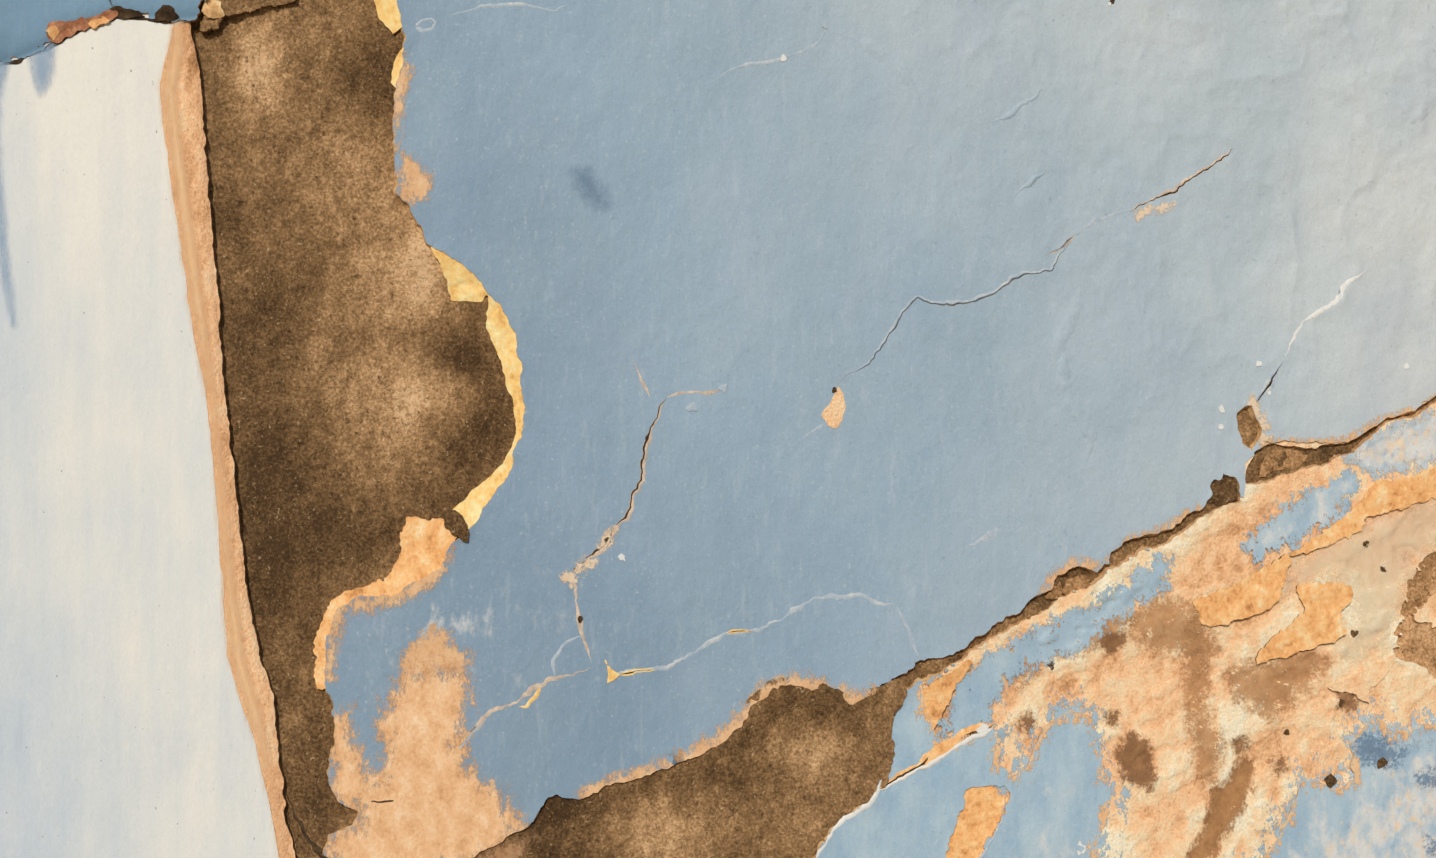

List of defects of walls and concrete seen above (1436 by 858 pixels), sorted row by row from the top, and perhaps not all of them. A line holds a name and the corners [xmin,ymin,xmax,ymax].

flaking render [45,9,118,44]
flaking render [192,0,907,858]
crack [459,269,1436,748]
crack [802,148,1233,520]
flaking render [914,396,1436,858]